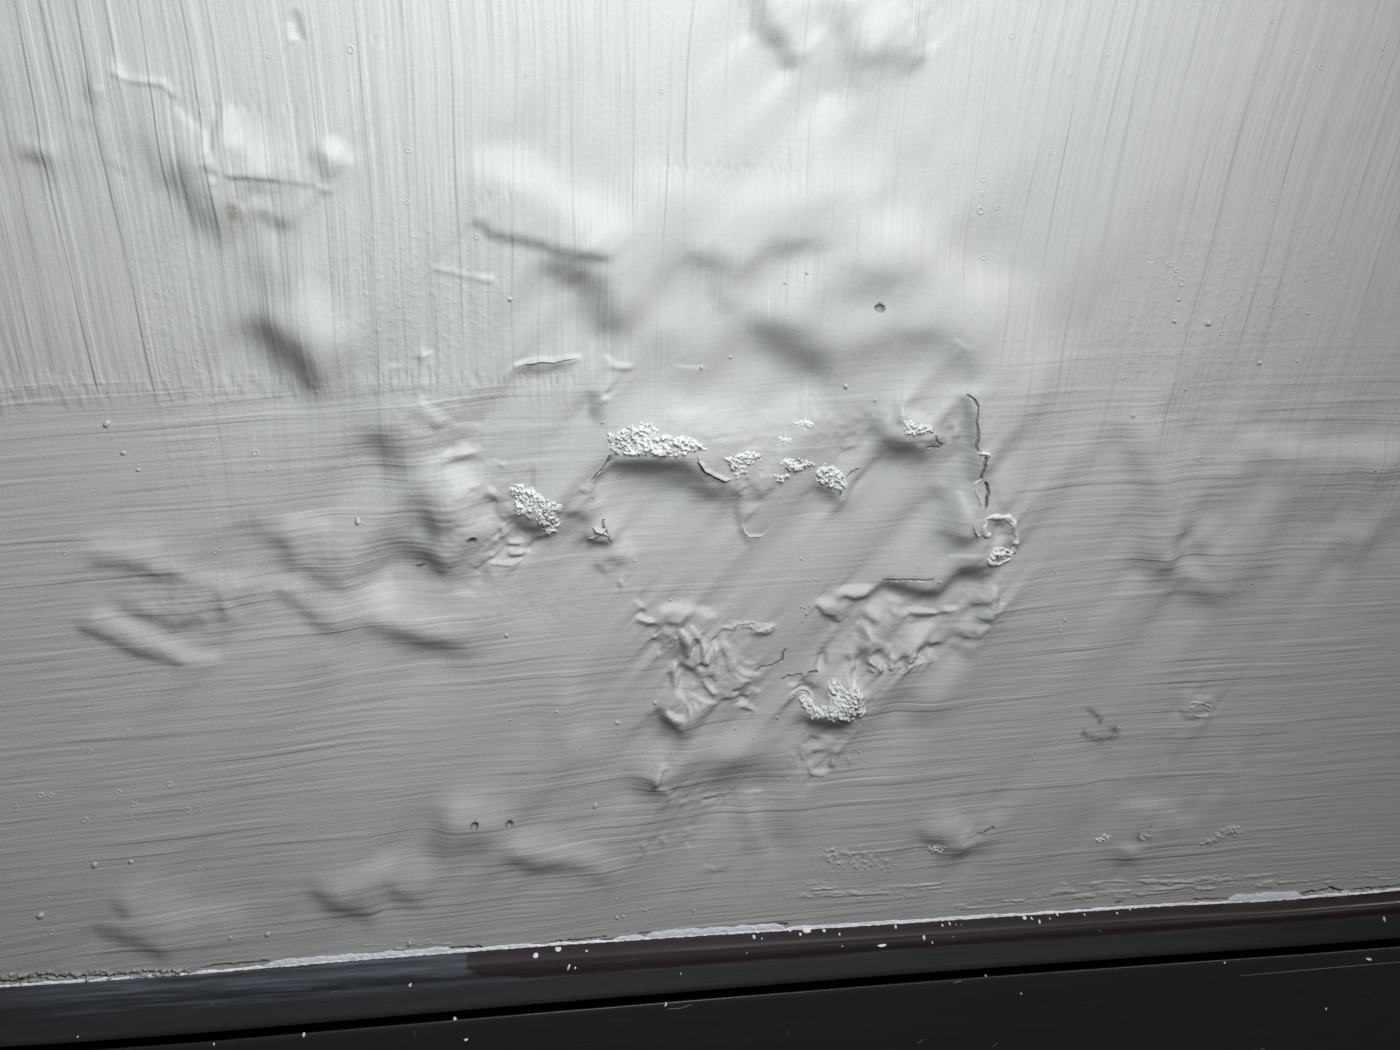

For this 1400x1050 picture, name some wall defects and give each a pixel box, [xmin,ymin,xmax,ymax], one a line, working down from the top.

peeling [607,421,761,482]
peeling [774,418,848,491]
peeling [903,420,936,437]
crack [926,394,991,510]
peeling [509,484,563,535]
spalling [973,479,1020,566]
peeling [780,678,867,796]